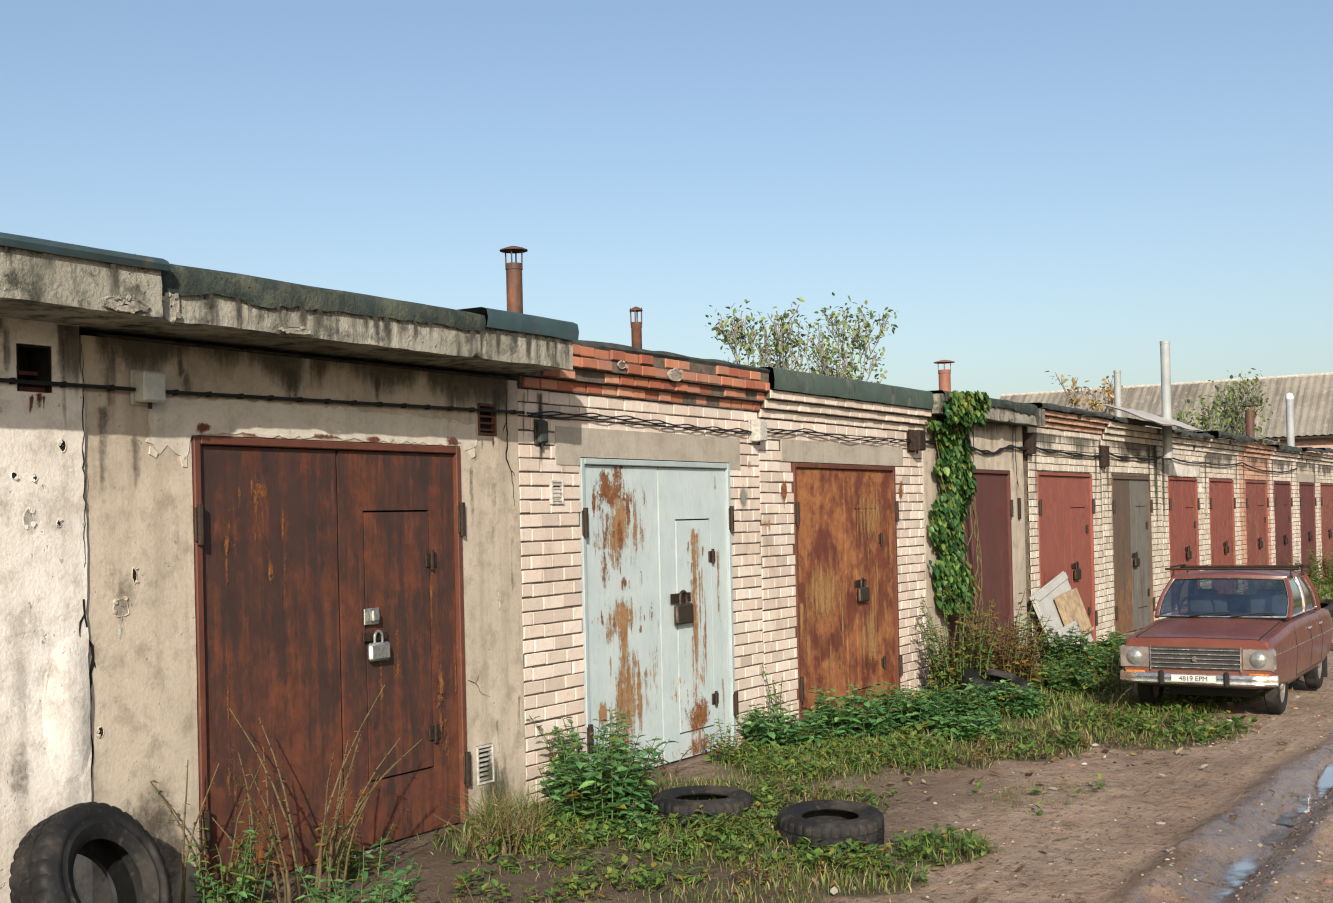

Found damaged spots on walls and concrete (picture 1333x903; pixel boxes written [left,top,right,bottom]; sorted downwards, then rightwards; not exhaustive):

damp [58,324,80,378]
damp [235,298,250,326]
damp [98,333,508,407]
damp [363,315,432,339]
damp [470,328,569,361]
rust [592,466,659,755]
rust [686,529,725,756]
rust [800,562,844,685]
rust [857,488,892,672]
rust [436,648,457,756]